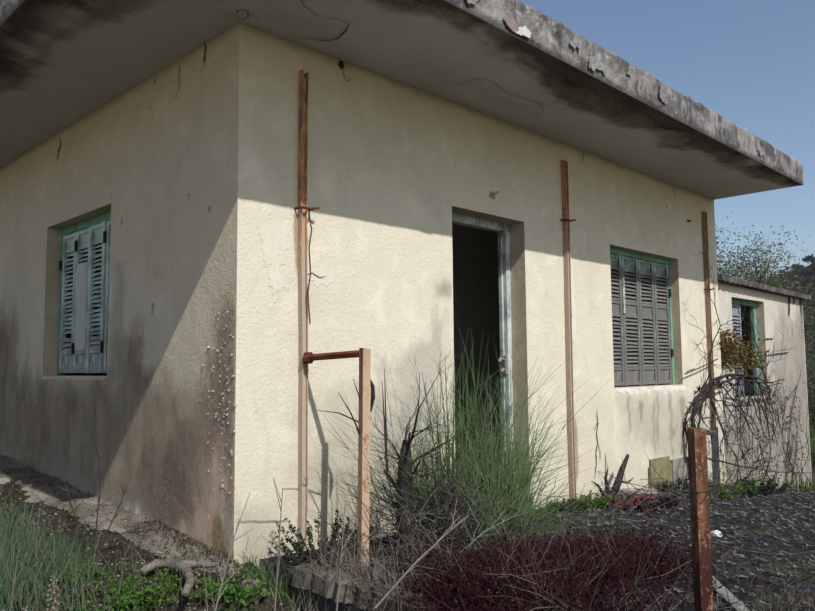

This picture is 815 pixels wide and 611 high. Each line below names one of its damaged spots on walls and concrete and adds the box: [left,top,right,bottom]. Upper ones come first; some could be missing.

leakage [0,0,98,84]
spalling [570,34,606,74]
leakage [392,0,802,186]
leakage [0,321,111,495]
leakage [115,341,215,529]